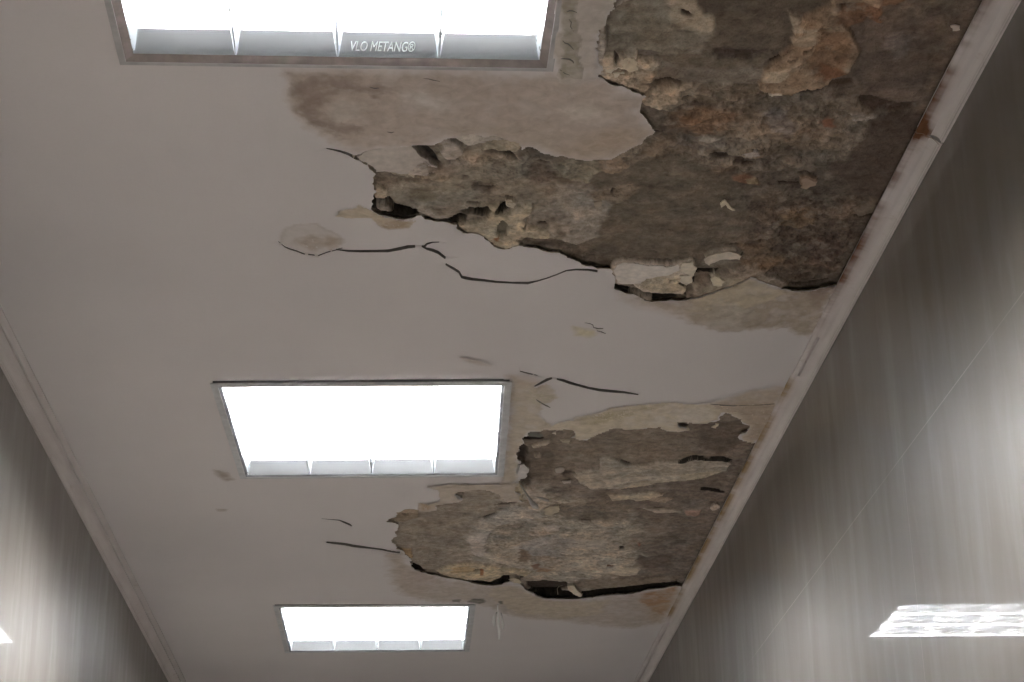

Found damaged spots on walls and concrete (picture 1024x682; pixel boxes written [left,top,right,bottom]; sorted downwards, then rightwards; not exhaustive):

water stain [277,67,655,161]
crack [326,148,356,159]
spalling [335,0,982,301]
crack [278,241,597,284]
water stain [609,278,836,339]
crack [520,371,638,408]
spalling [388,373,774,598]
water stain [380,373,802,629]
crack [326,519,400,553]